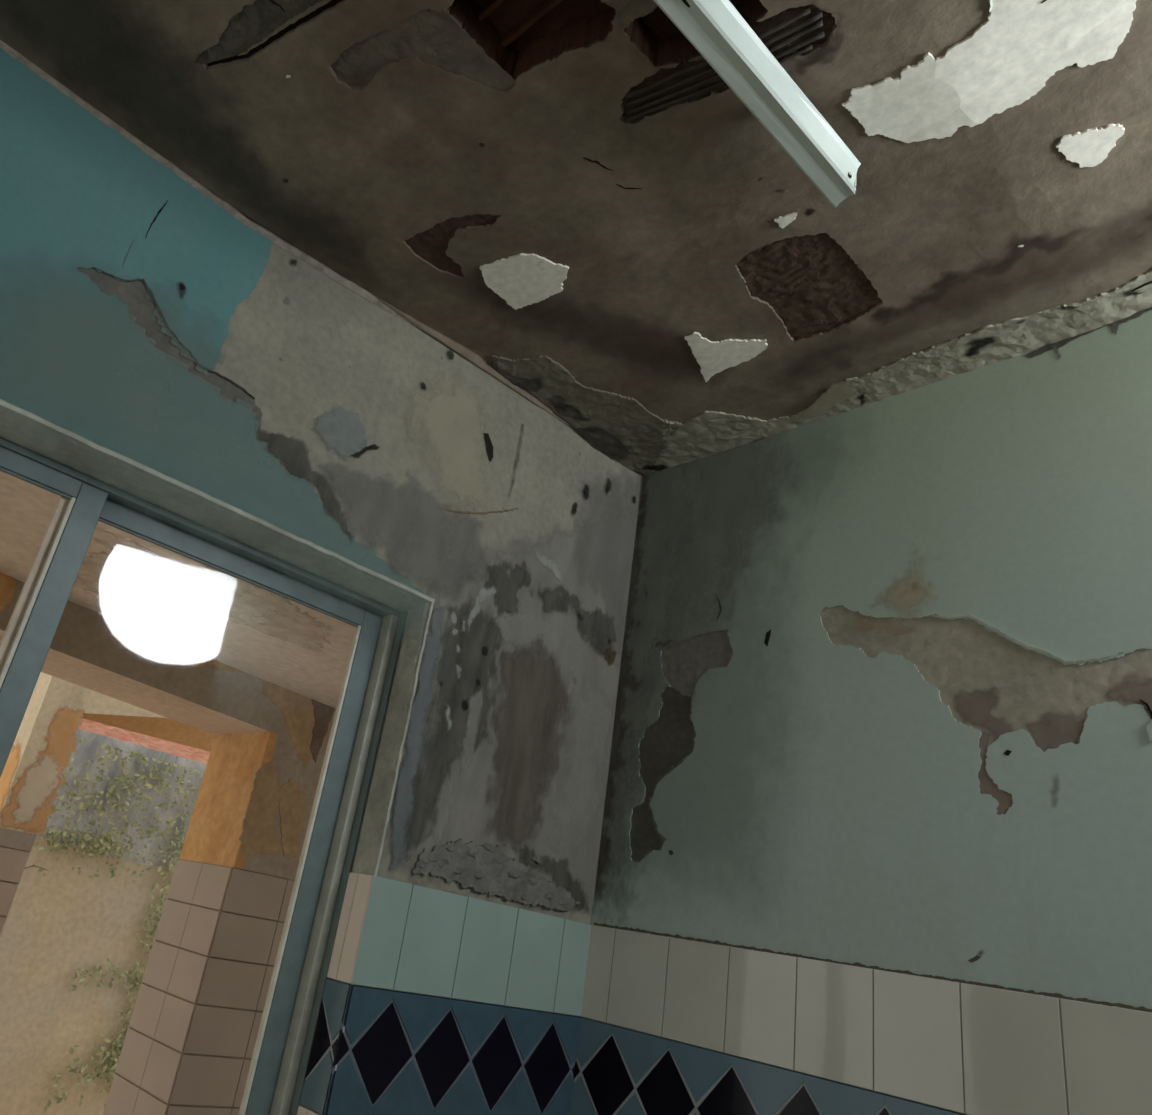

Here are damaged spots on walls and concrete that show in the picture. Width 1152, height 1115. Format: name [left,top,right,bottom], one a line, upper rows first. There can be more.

spalling [195,0,322,66]
crack [208,0,342,66]
spalling [448,0,728,123]
spalling [729,0,841,69]
peeling [842,0,1137,143]
peeling [1056,123,1125,168]
spalling [405,214,500,277]
spalling [736,210,882,341]
peeling [74,243,1152,924]
water stain [404,441,776,910]